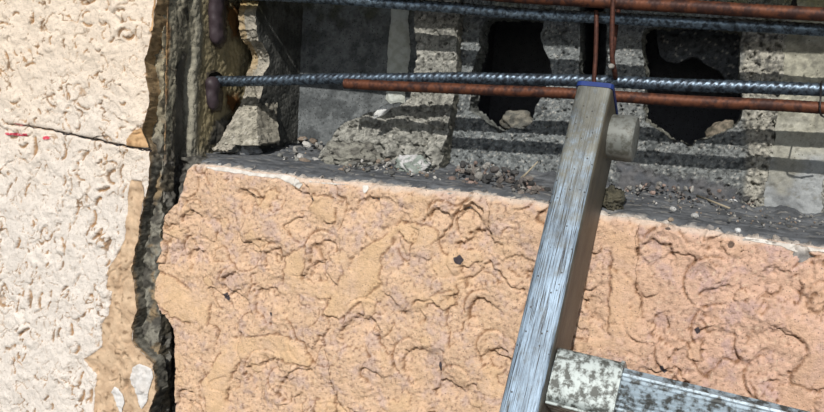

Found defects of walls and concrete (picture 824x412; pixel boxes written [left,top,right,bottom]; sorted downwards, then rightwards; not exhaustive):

crack [8,124,152,152]
spalling [207,167,312,189]
spalling [215,0,824,145]
peeling [84,180,156,412]